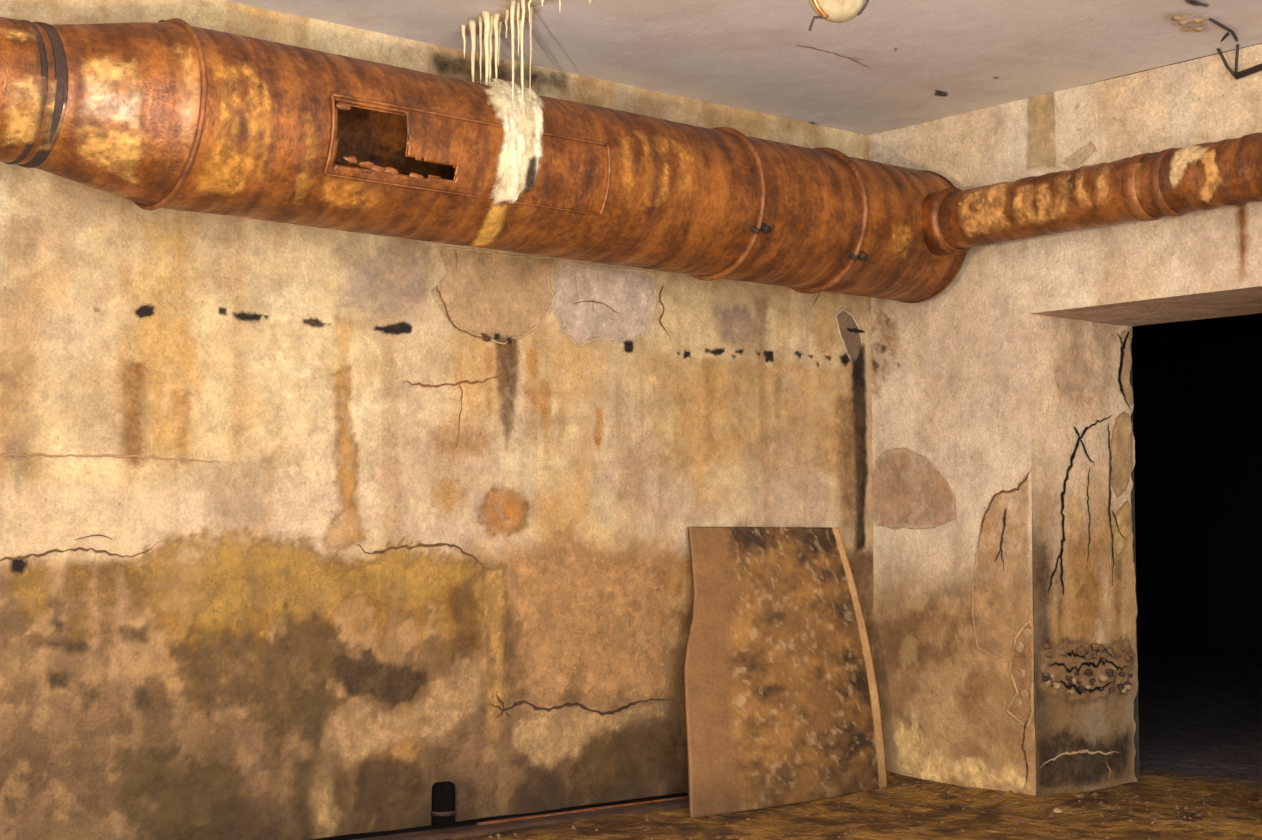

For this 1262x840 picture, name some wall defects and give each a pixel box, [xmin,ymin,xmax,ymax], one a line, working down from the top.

rust [343,156,424,178]
rust [474,206,504,246]
rust [1237,203,1247,275]
crack [0,534,161,561]
water stain [124,369,670,753]
flaking render [872,448,957,529]
crack [979,468,1032,570]
spalling [971,473,1134,728]
crack [1048,331,1131,595]
crack [492,694,674,718]
water stain [295,759,421,826]
water stain [574,712,676,794]